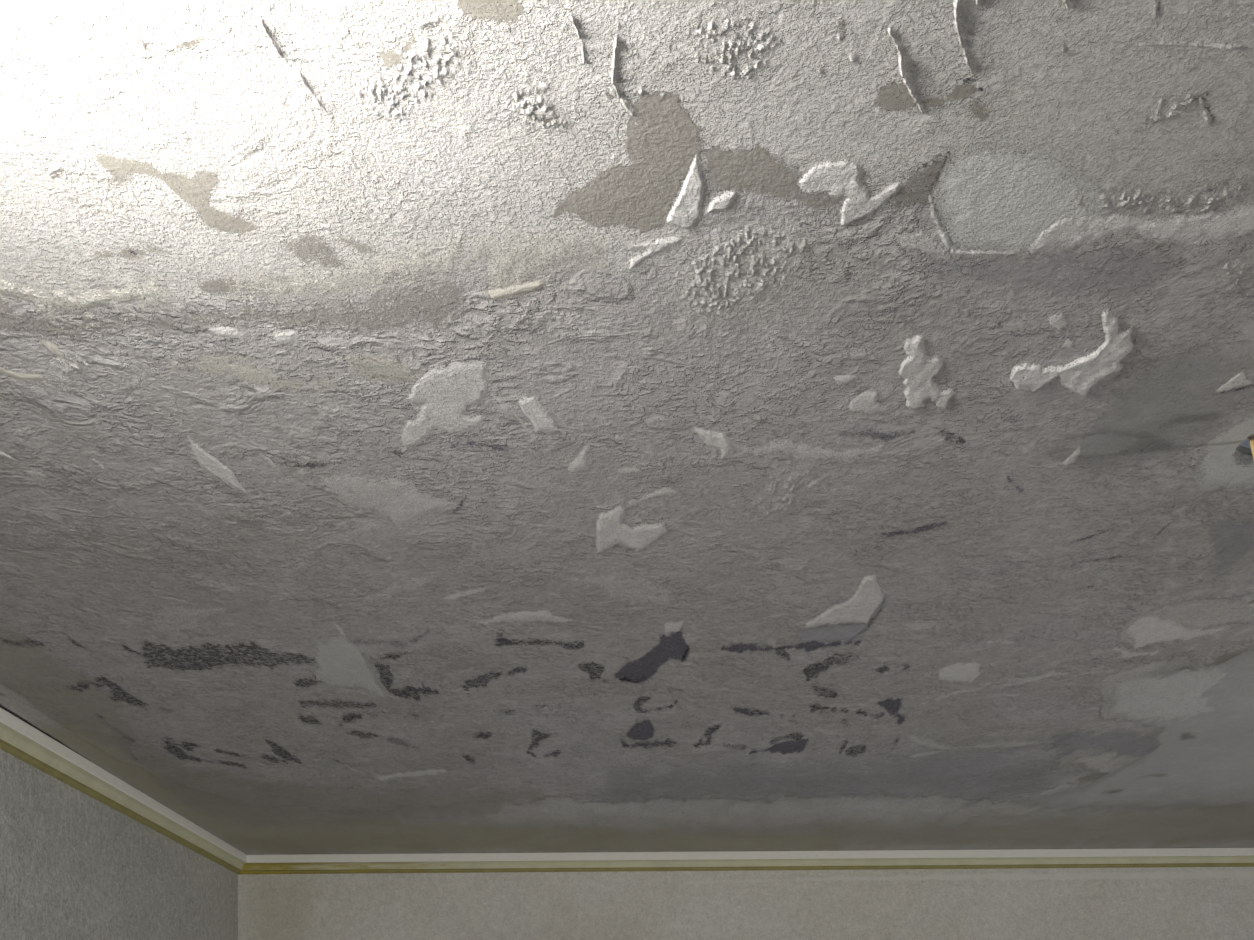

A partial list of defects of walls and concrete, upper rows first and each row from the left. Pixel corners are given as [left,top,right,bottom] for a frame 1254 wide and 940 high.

peeling [455,0,523,24]
peeling [357,14,444,67]
peeling [0,82,1254,815]